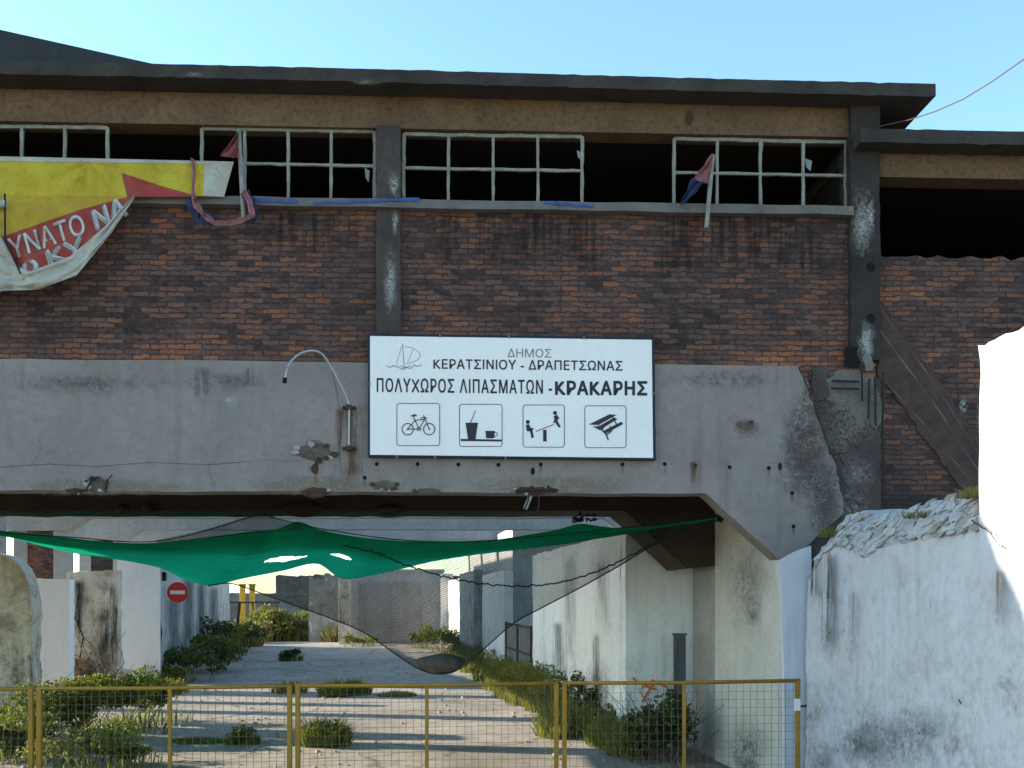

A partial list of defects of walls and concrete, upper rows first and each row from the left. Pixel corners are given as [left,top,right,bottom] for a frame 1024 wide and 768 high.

spalling [290,441,338,464]
rust [283,411,355,492]
spalling [65,475,112,495]
spalling [369,480,400,491]
damp [99,587,117,663]